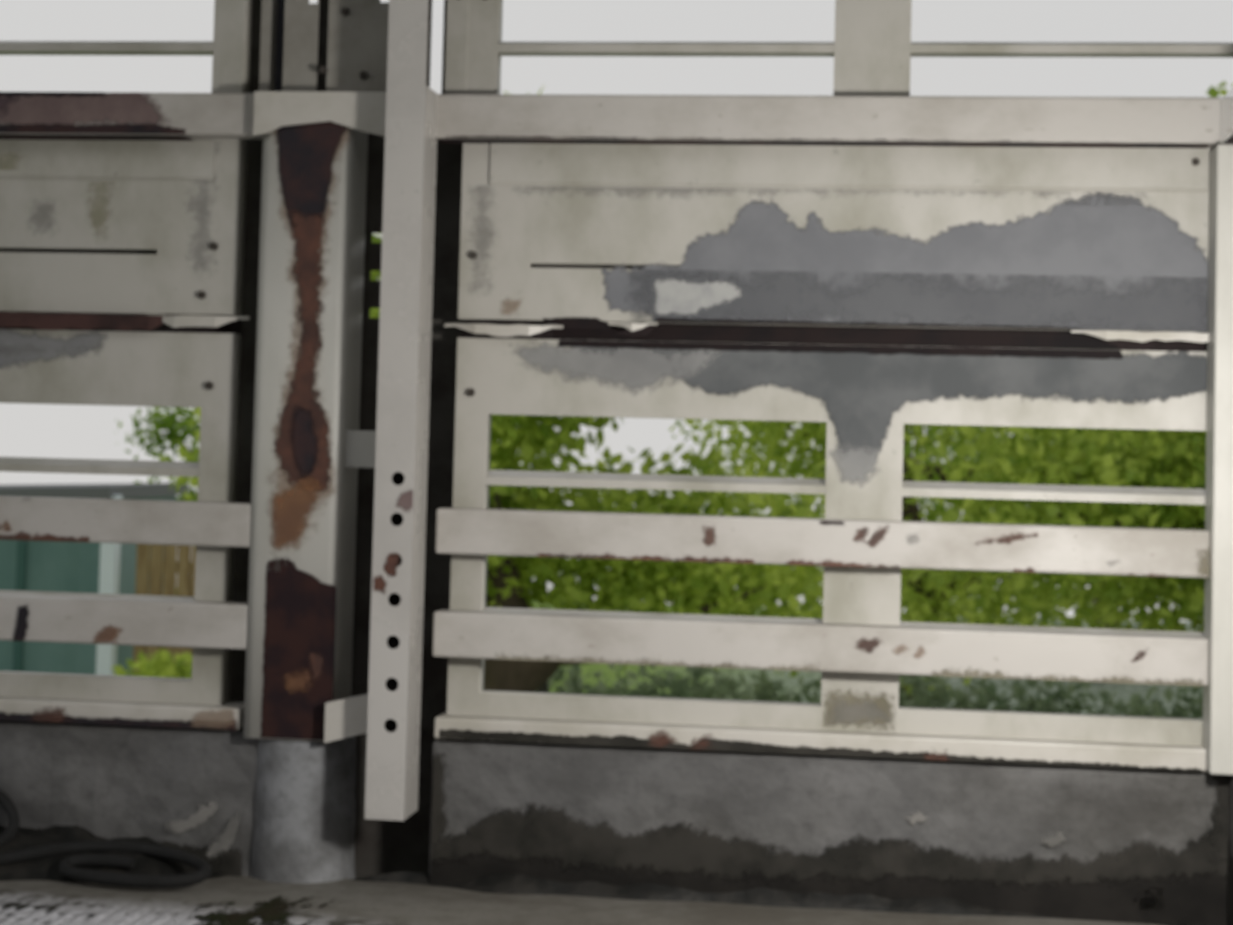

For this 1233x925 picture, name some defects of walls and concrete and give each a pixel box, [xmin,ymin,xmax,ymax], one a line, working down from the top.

corrosion [0,92,193,141]
peeling [543,192,1208,359]
corrosion [260,122,348,740]
corrosion [396,490,413,511]
corrosion [0,522,89,543]
corrosion [537,528,754,564]
corrosion [854,527,889,547]
corrosion [988,533,1037,544]
corrosion [374,553,399,593]
corrosion [13,605,29,642]
corrosion [94,626,121,643]
water stain [430,752,1233,925]